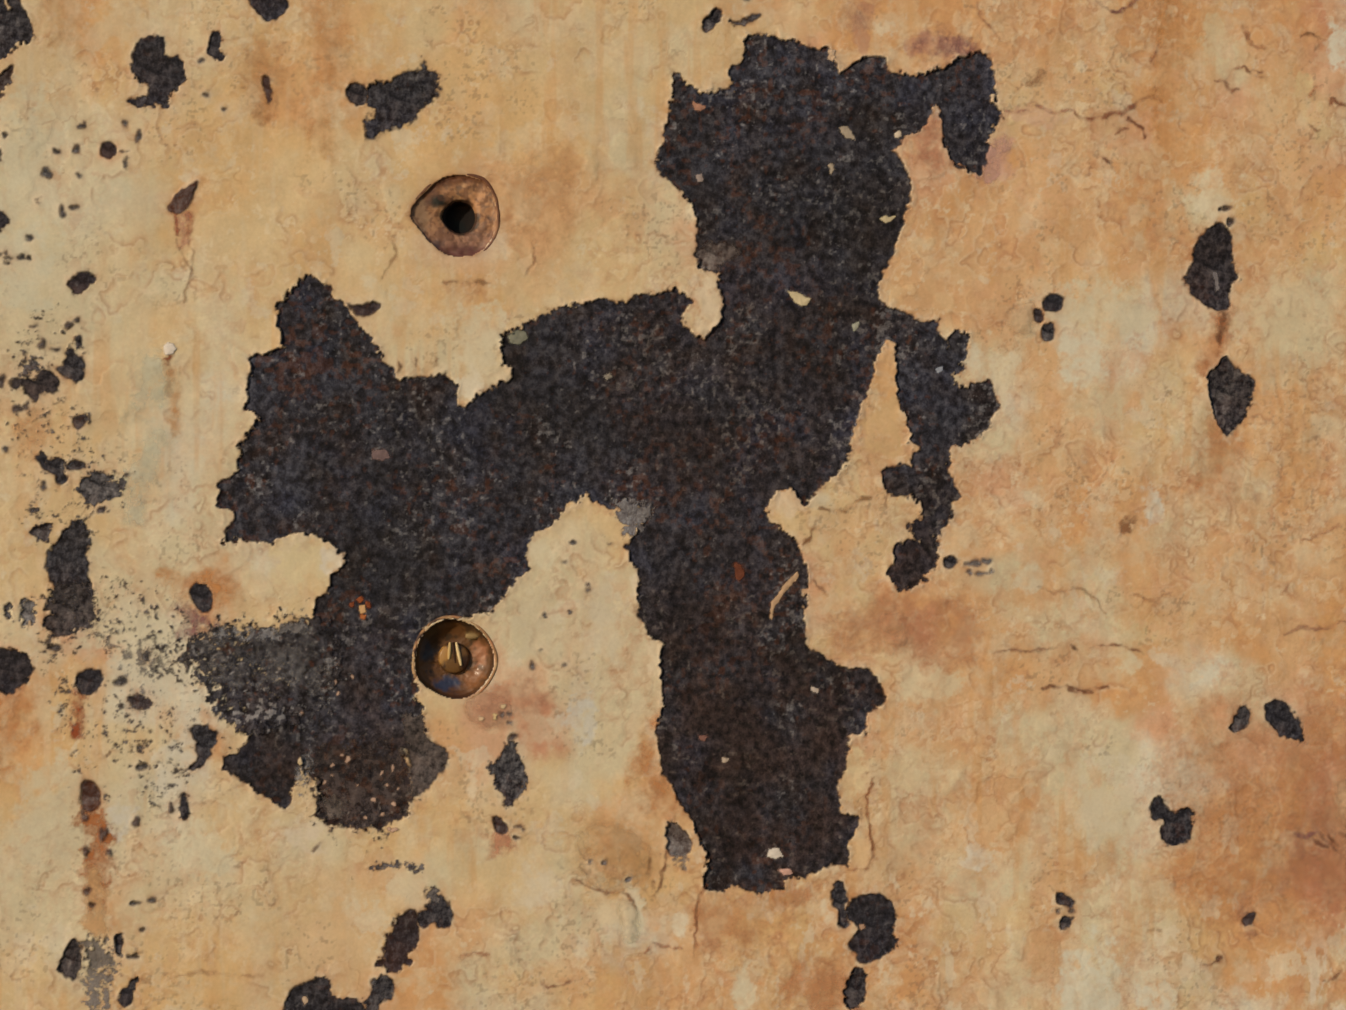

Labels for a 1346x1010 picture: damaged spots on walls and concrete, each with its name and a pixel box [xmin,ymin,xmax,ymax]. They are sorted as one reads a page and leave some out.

corrosion [982,140,1010,183]
peeling [1183,206,1238,311]
peeling [1207,356,1255,436]
peeling [0,0,1004,1010]
peeling [1229,699,1304,742]
corrosion [80,780,116,935]
peeling [1150,795,1195,846]